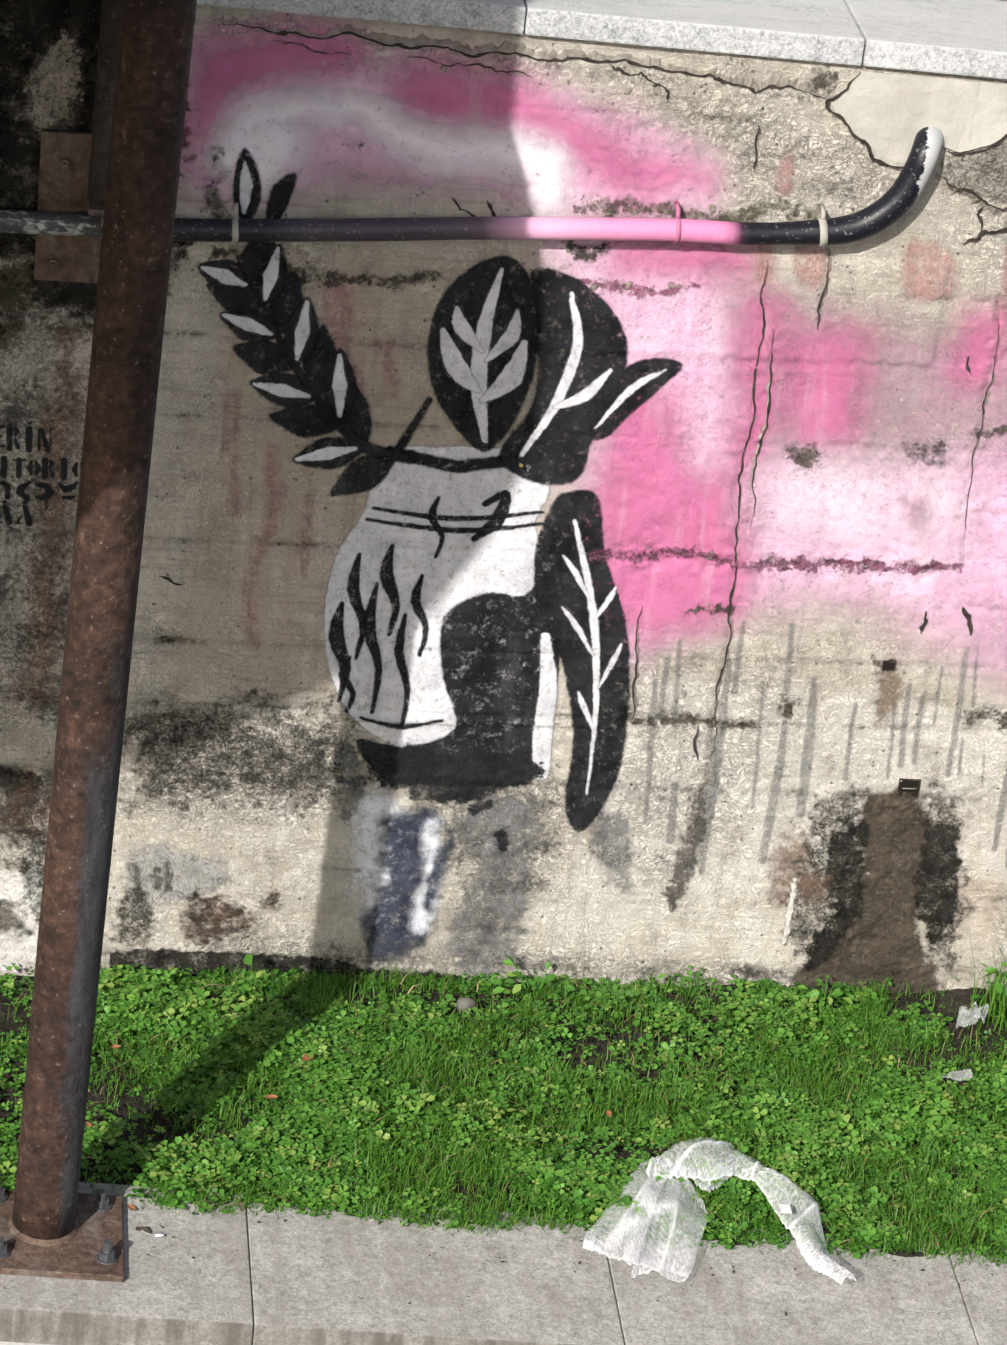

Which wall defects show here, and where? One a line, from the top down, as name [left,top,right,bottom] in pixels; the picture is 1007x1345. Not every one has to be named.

damp [0,0,102,211]
crack [452,197,496,217]
crack [213,16,903,169]
crack [935,134,1007,244]
corrosion [18,324,84,704]
crack [693,259,774,760]
crack [962,313,1002,559]
corrosion [2,773,51,840]
damp [0,766,53,972]
damp [123,689,372,818]
damp [109,888,473,982]
damp [760,651,976,993]